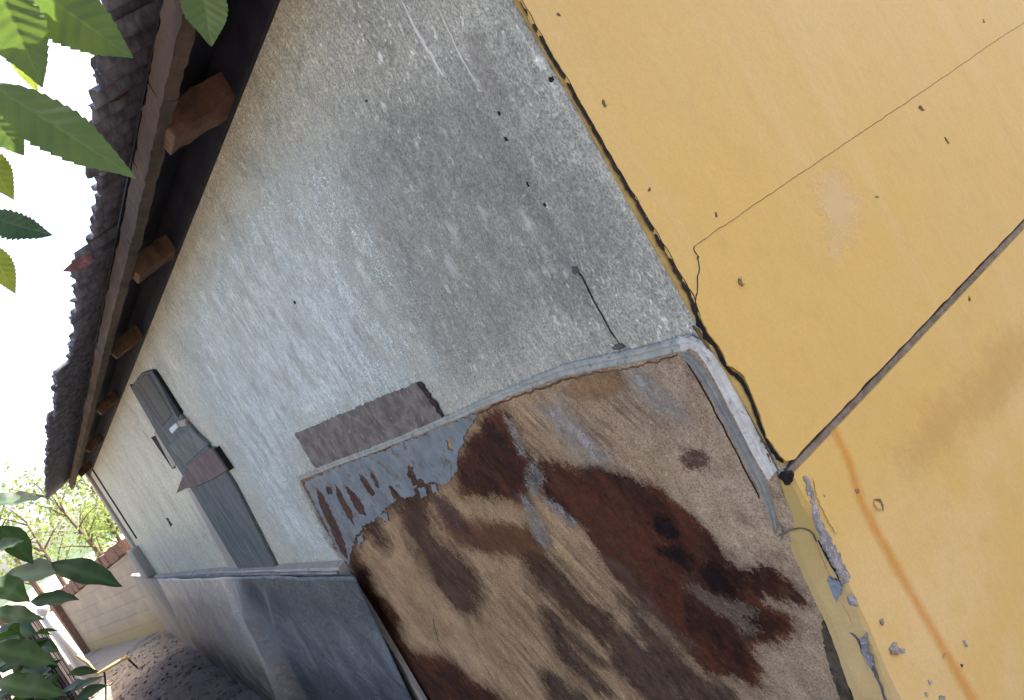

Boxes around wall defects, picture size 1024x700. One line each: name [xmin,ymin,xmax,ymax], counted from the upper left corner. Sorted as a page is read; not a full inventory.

crack [519,0,1023,317]
peeling [304,413,479,575]
water stain [350,554,504,700]
water stain [398,494,484,618]
water stain [542,405,608,464]
water stain [515,547,736,700]
water stain [682,582,767,640]
spalling [803,476,858,607]
spalling [821,620,854,700]
peeling [873,499,884,511]